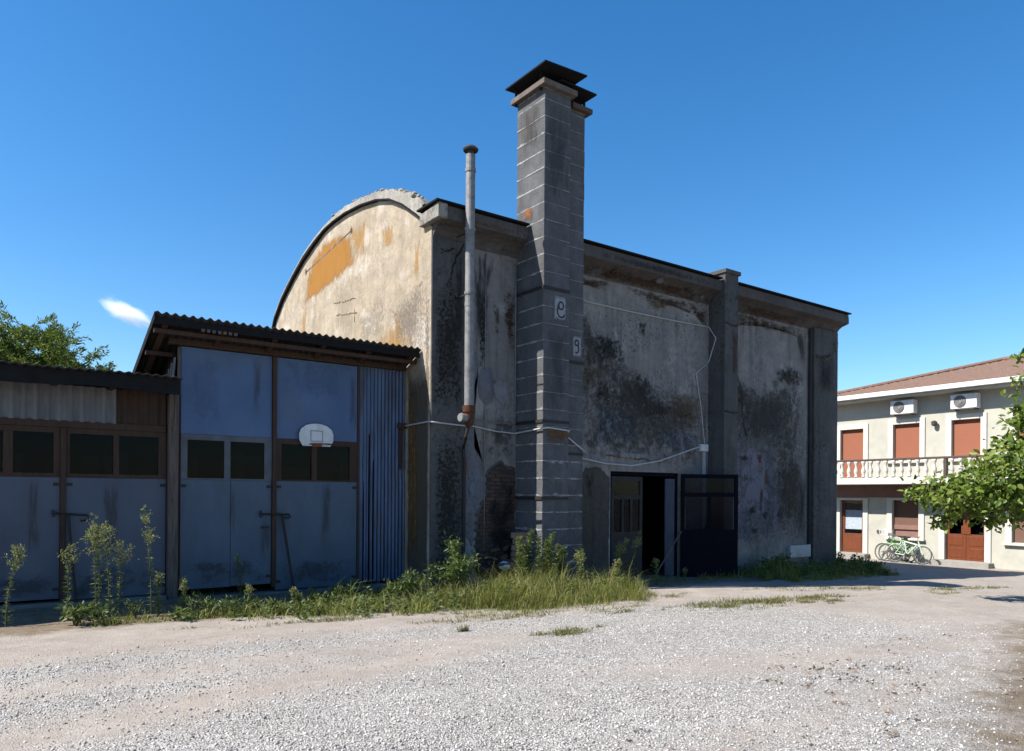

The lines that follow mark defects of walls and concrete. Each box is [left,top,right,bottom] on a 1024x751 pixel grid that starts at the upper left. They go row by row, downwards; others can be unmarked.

water stain [363,258,515,574]
spalling [464,351,516,578]
water stain [582,318,698,454]
water stain [737,368,805,538]